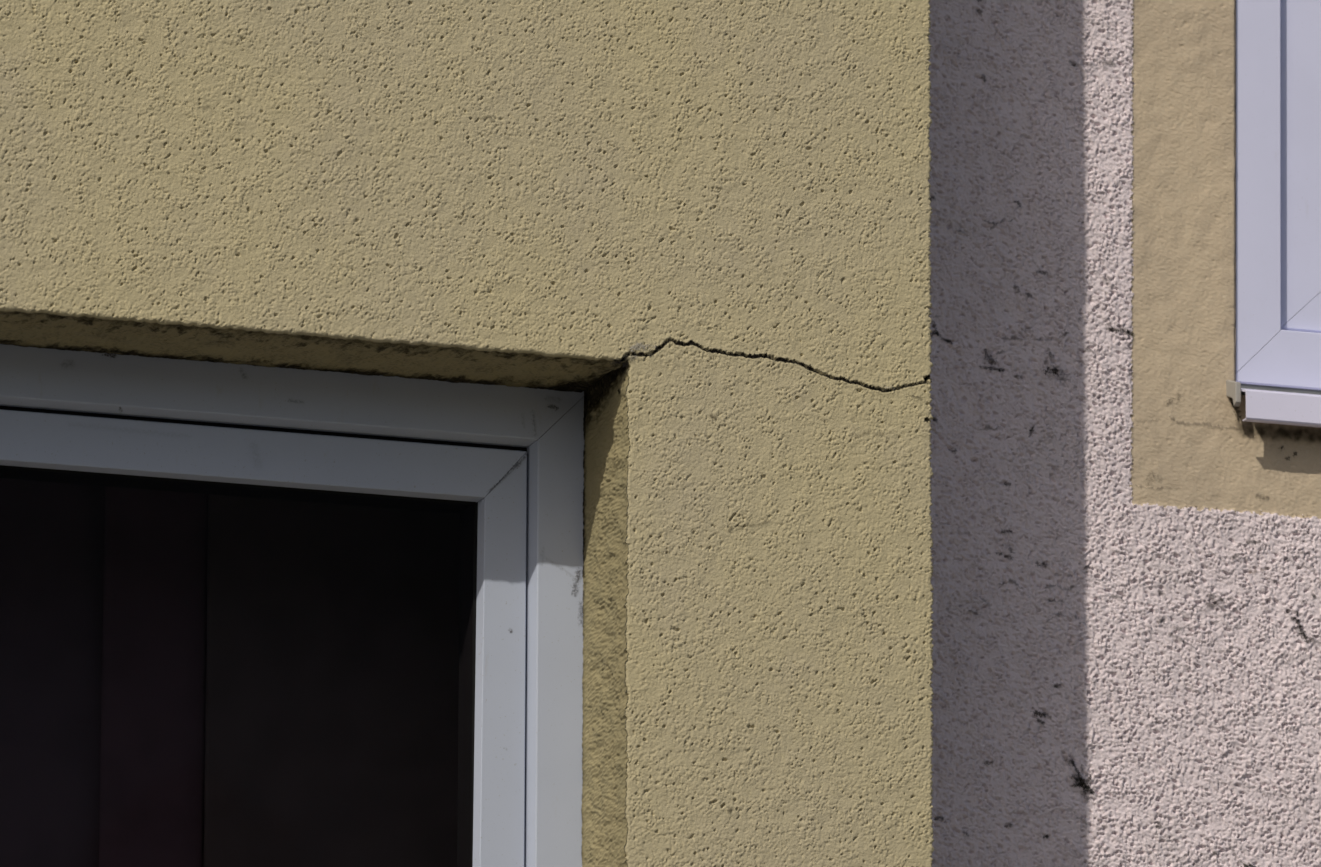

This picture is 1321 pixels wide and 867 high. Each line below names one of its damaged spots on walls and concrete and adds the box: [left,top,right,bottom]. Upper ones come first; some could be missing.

crack [622,339,927,392]